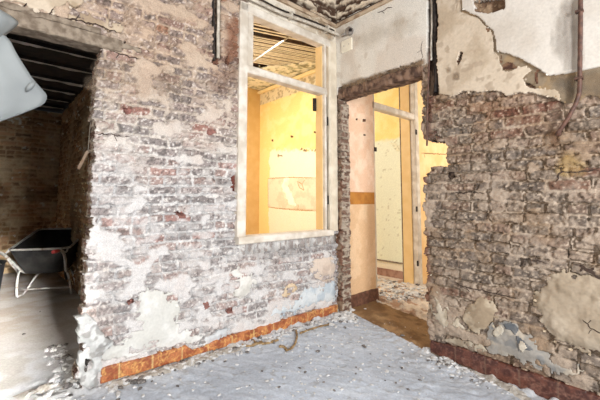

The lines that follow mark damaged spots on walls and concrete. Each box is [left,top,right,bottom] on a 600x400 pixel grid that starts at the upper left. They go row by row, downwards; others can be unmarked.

crack [42,8,140,59]
peeling [248,77,275,91]
peeling [259,61,315,78]
peeling [436,0,600,104]
peeling [268,176,316,211]
peeling [231,266,257,299]
peeling [271,256,336,318]
peeling [74,287,231,388]
peeling [428,291,584,376]